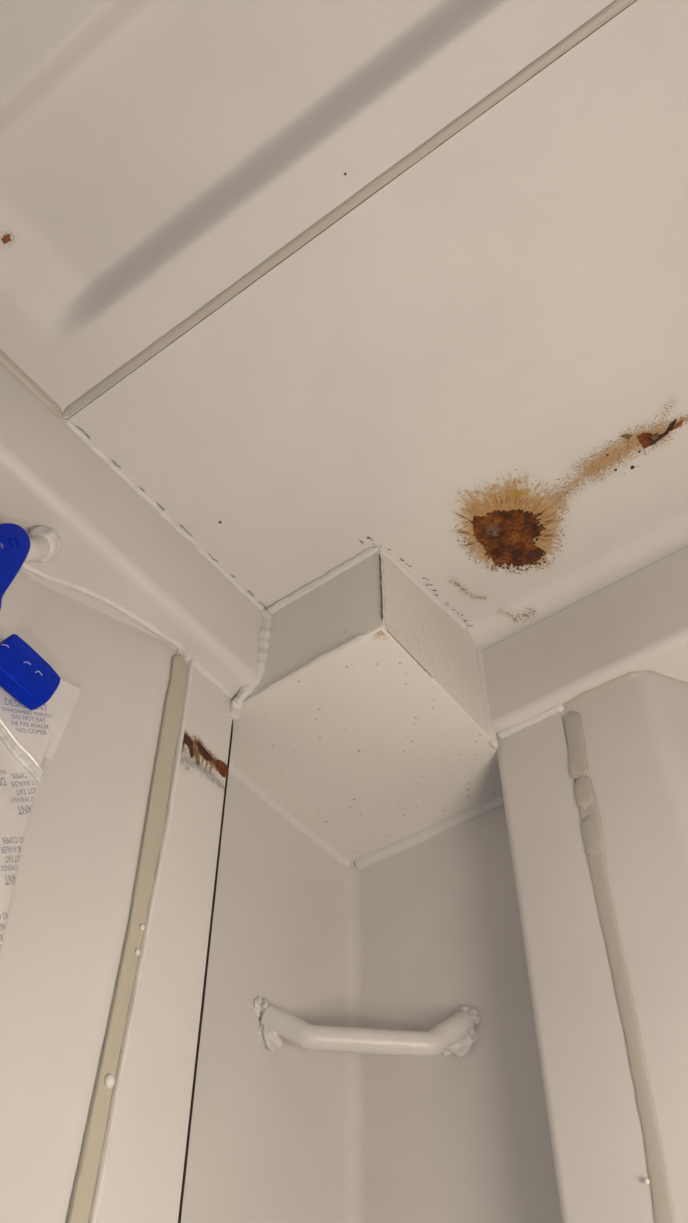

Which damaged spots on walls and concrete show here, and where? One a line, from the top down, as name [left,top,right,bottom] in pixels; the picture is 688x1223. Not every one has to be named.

rust [452,402,688,574]
rust [181,731,229,778]